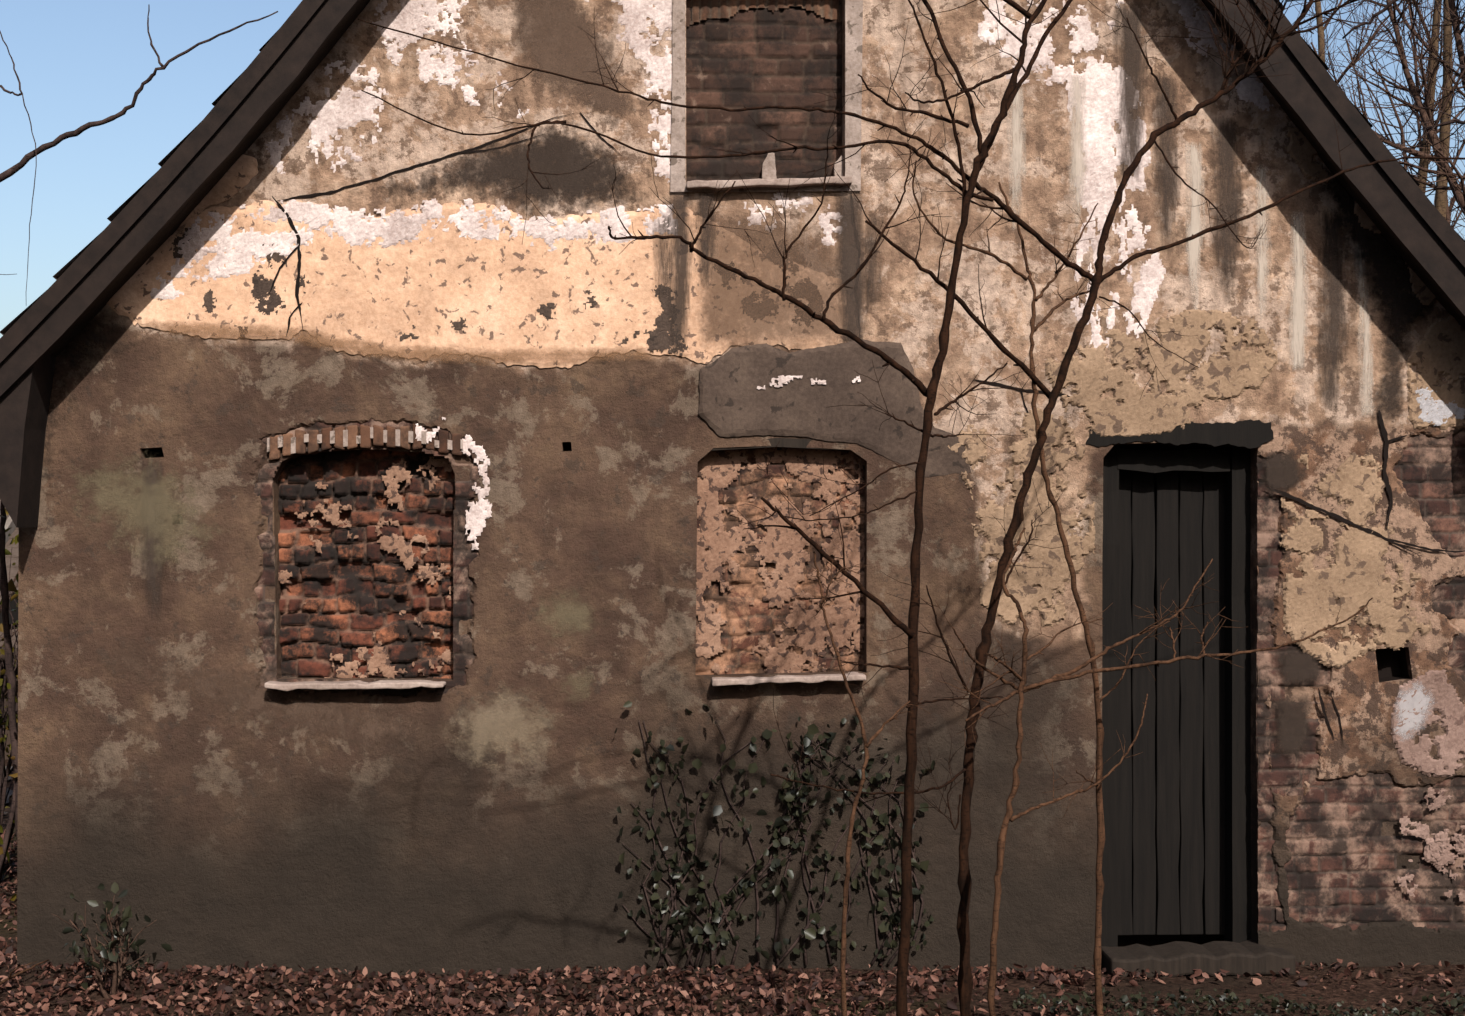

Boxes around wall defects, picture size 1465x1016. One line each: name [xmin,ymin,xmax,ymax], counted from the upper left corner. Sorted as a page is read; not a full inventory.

crack [268,112,622,336]
peeling [107,0,847,368]
leakage [382,127,635,214]
leakage [517,0,631,124]
leakage [1010,92,1023,197]
leakage [1072,77,1085,206]
leakage [1115,7,1267,308]
leakage [1291,168,1435,418]
spalling [1256,262,1465,932]